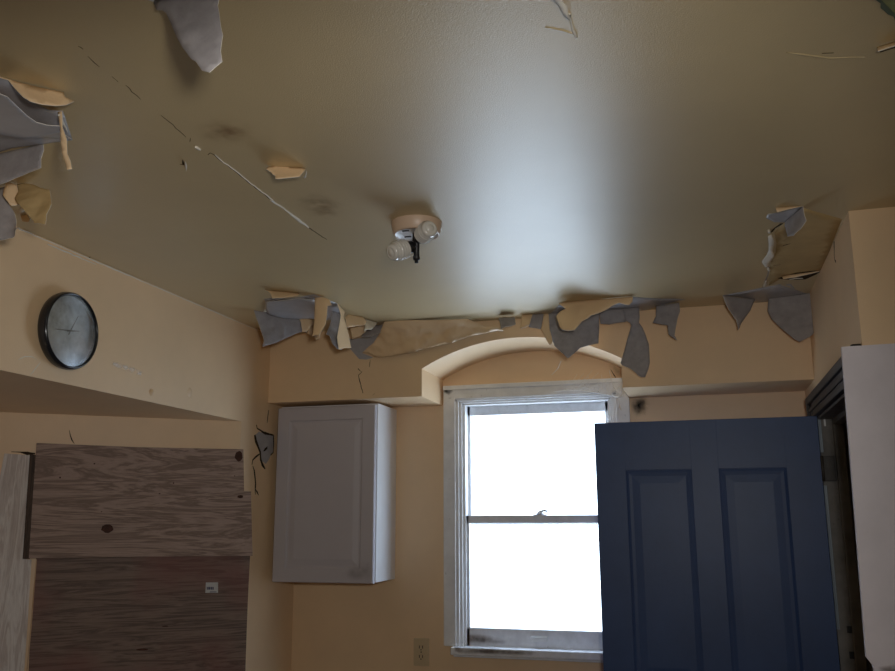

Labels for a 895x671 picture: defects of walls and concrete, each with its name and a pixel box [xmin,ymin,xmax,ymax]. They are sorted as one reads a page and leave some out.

peeling [150,0,223,73]
peeling [0,76,74,240]
crack [162,116,327,240]
peeling [266,166,307,179]
peeling [723,206,842,342]
peeling [254,290,379,360]
peeling [499,296,684,377]